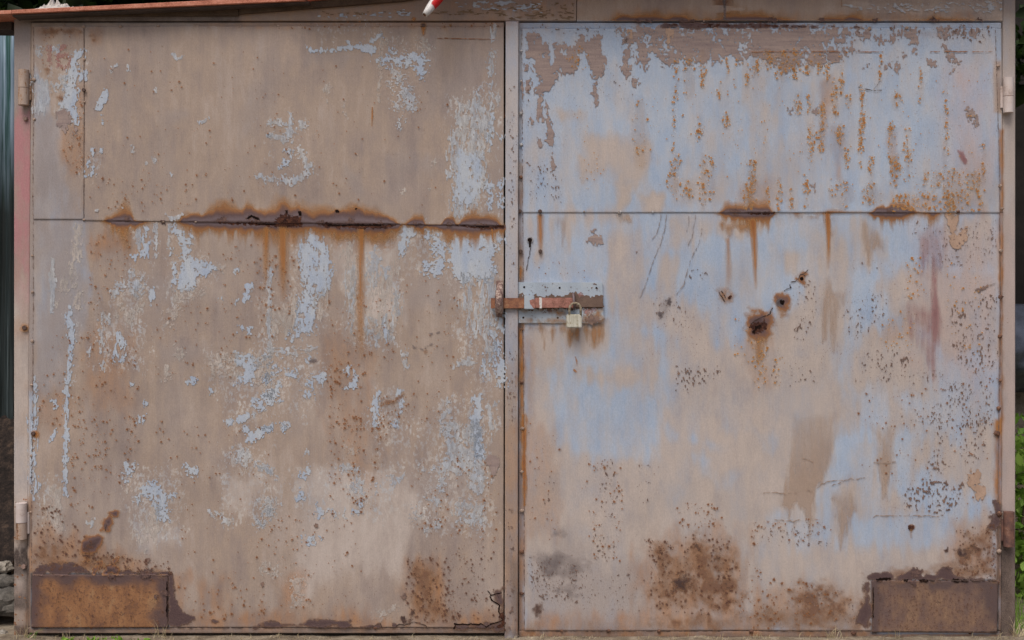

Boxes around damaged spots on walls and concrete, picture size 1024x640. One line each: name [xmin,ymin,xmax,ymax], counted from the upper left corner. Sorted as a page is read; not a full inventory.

peeling [30,40,88,135]
peeling [94,88,109,125]
peeling [254,111,315,187]
peeling [305,9,431,132]
peeling [431,0,1002,219]
rust [666,48,986,277]
peeling [26,212,218,501]
rust [14,167,506,632]
peeling [185,218,517,546]
peeling [121,460,178,523]
rust [646,500,1002,632]